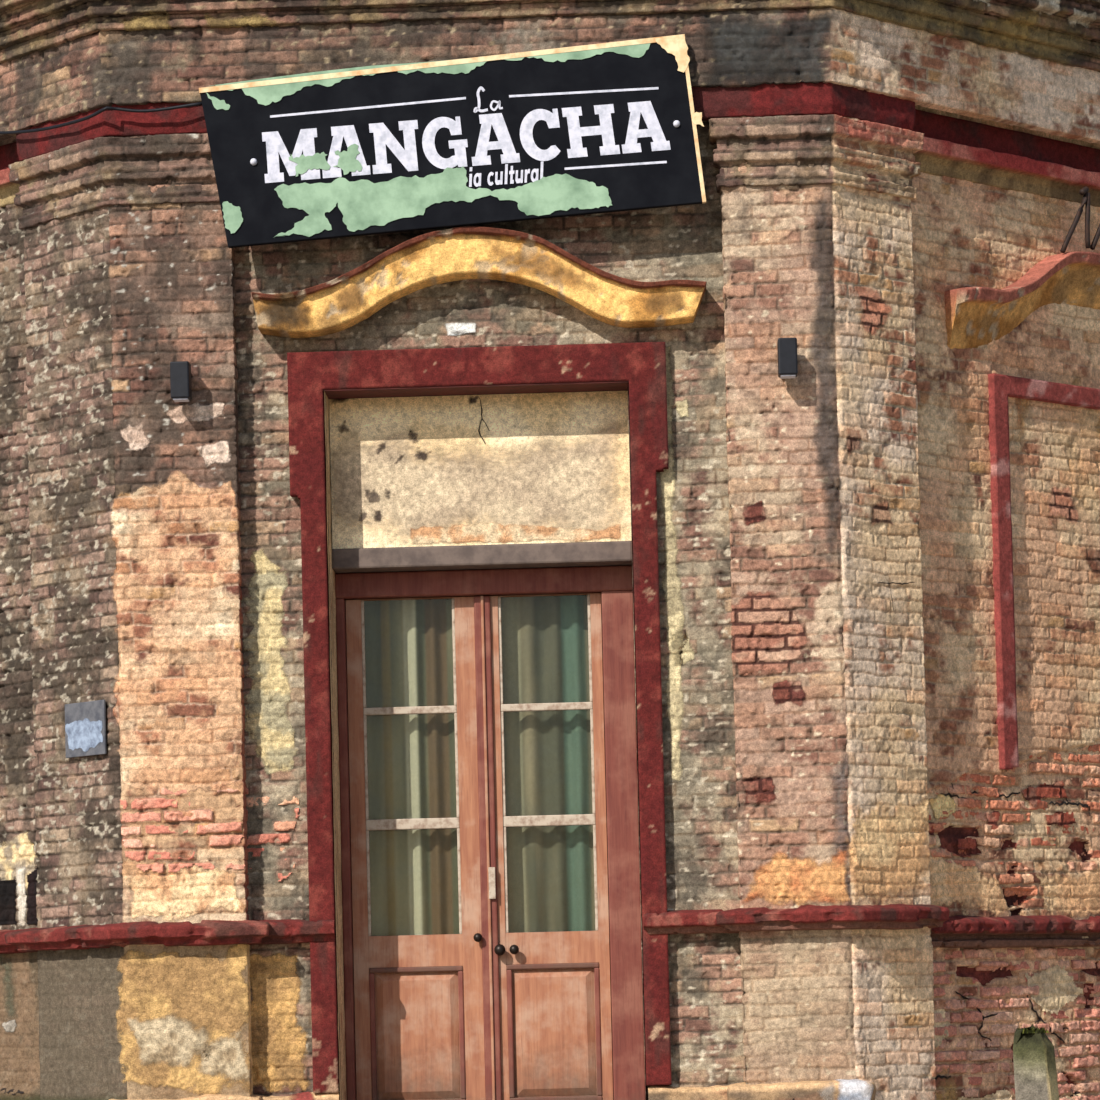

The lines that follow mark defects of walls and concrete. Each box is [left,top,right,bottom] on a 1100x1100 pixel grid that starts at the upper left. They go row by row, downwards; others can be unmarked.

spalling [1031,0,1096,27]
crack [478,397,490,444]
flaking render [743,500,766,525]
flaking render [731,591,809,706]
spalling [742,744,1100,916]
flaking render [2,1020,17,1032]
flaking render [116,944,308,1094]
crack [955,991,998,1041]
crack [1027,995,1069,1043]